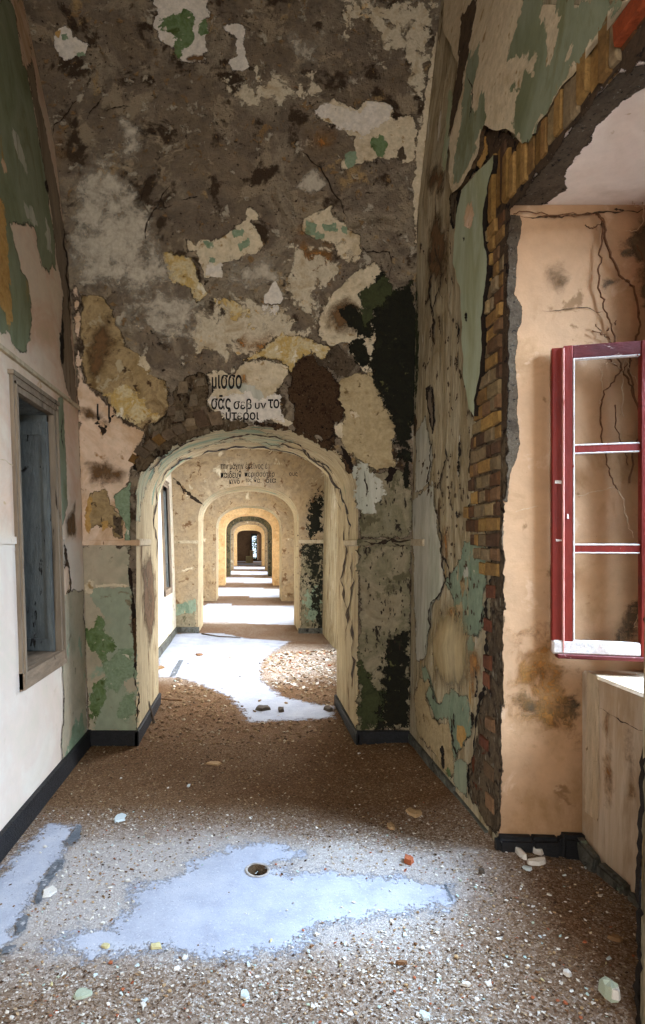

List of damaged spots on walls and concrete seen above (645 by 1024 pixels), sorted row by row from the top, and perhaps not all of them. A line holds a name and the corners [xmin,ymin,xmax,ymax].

crack [519,208,643,219]
peeling [0,0,444,662]
water stain [306,488,324,538]
water stain [338,271,420,489]
flaking render [414,0,645,835]
peeling [61,544,142,760]
water stain [518,640,579,728]
flaking render [632,749,645,1024]